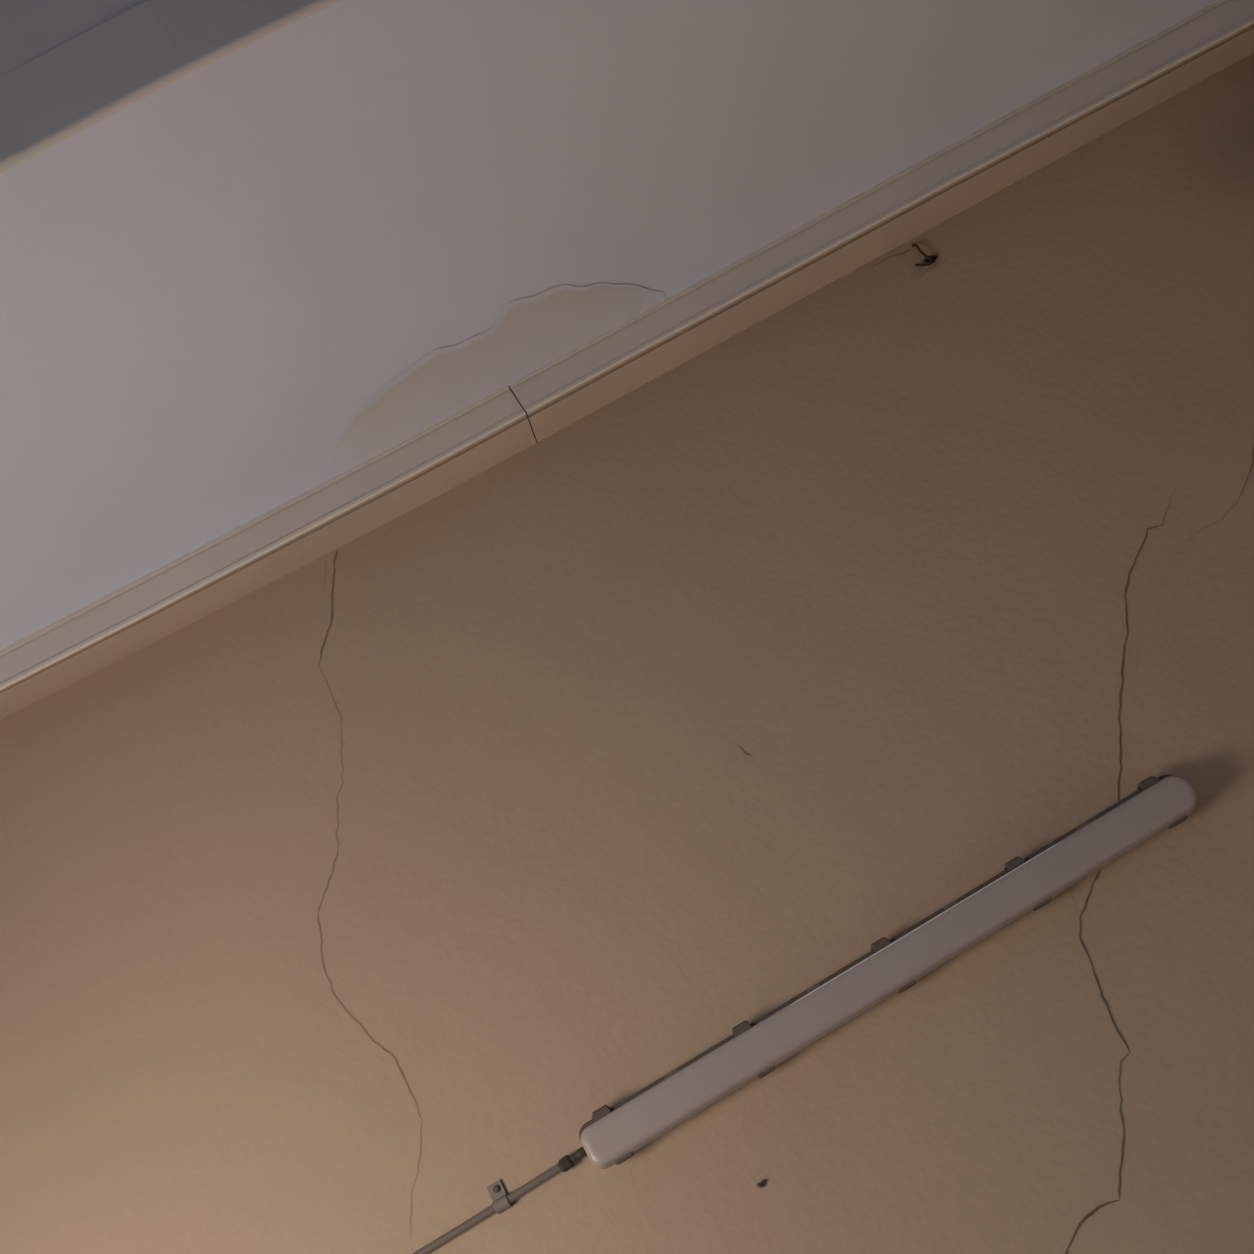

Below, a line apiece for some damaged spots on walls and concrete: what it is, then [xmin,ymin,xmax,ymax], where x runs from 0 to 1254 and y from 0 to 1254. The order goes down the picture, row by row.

leakage [330,283,665,476]
crack [1118,567,1133,800]
crack [1085,869,1101,905]
crack [1079,937,1130,1061]
crack [1065,1091,1125,1254]